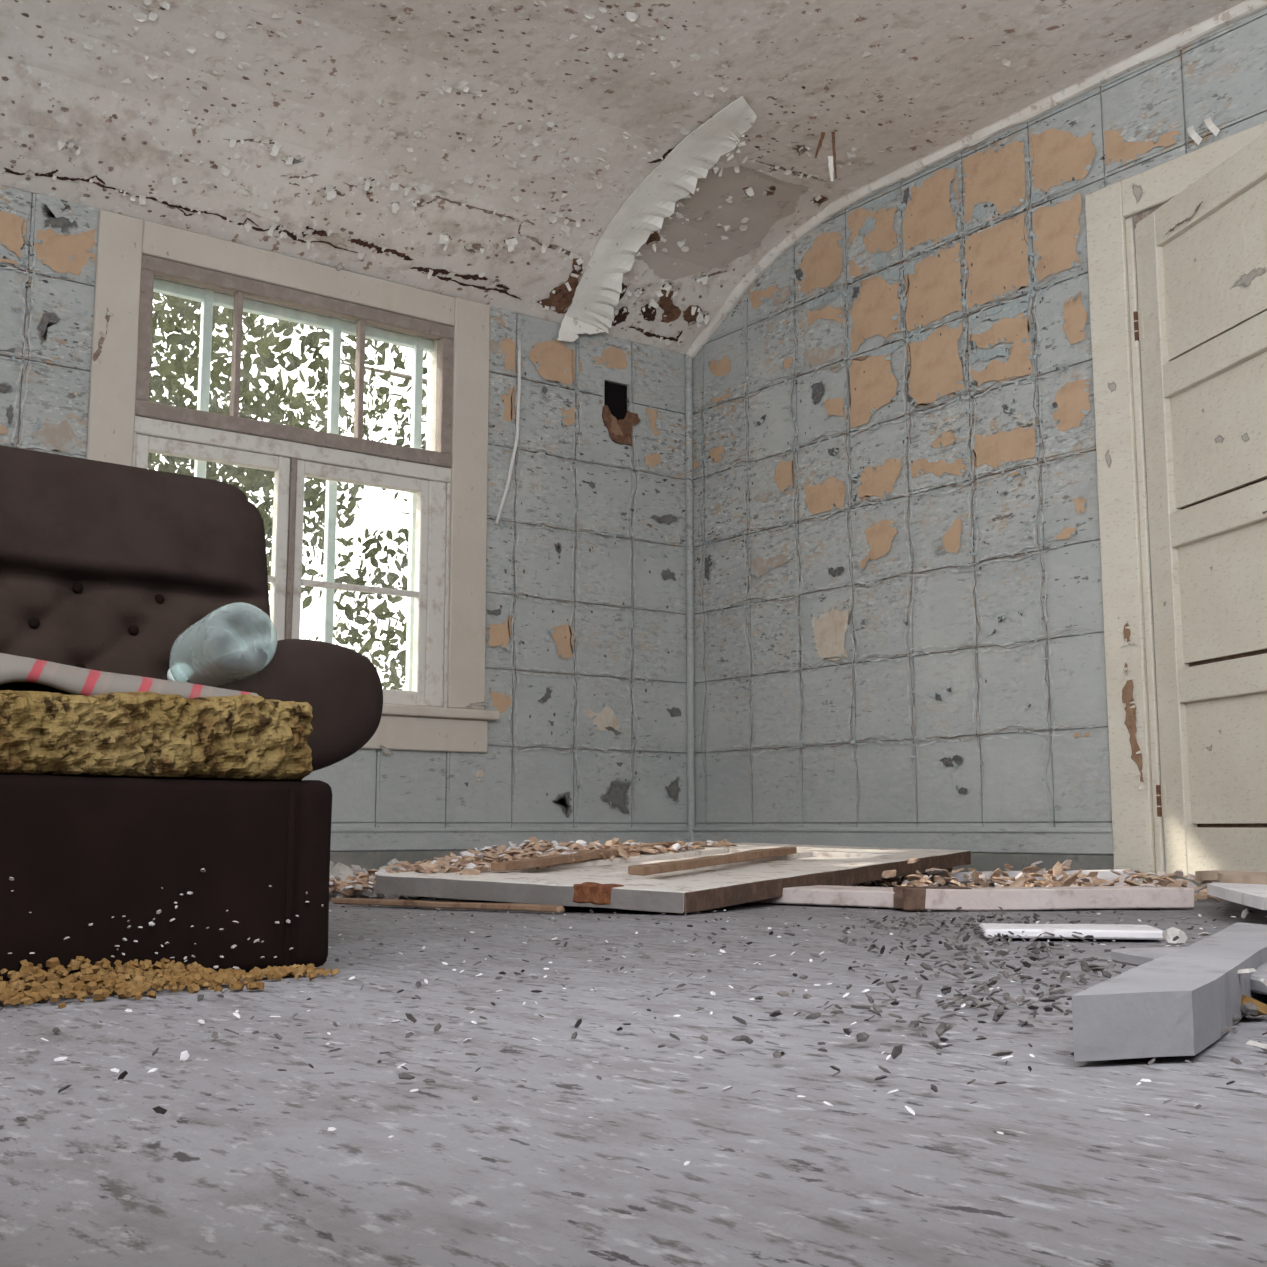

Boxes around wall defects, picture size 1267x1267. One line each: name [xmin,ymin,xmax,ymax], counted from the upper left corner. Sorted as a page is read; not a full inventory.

peeling [768,79,883,159]
peeling [0,211,96,275]
peeling [489,333,667,446]
peeling [610,121,1180,591]
crack [0,133,1106,823]
peeling [810,607,850,661]
peeling [1118,621,1134,647]
spalling [940,755,962,769]
peeling [1120,662,1147,789]